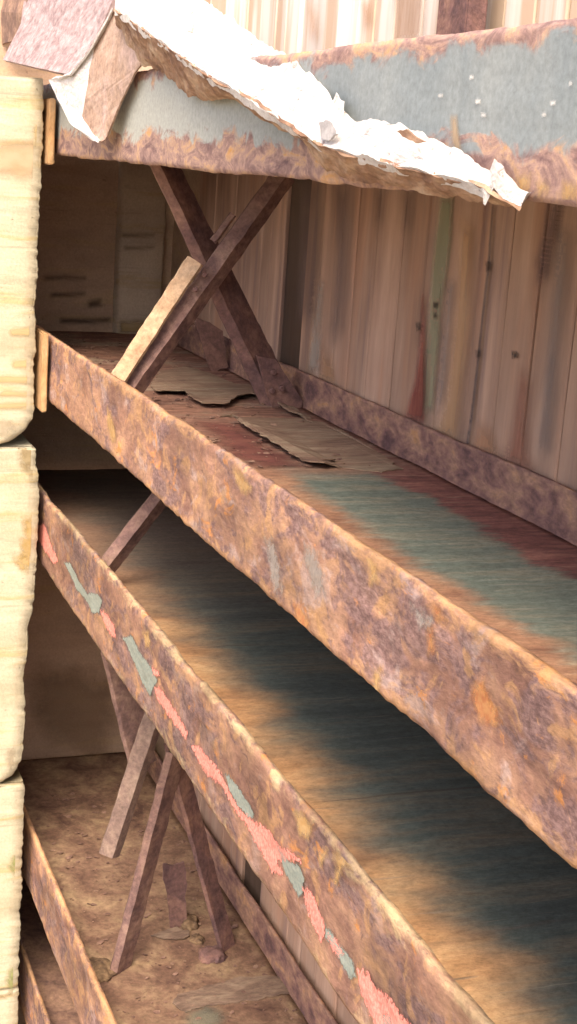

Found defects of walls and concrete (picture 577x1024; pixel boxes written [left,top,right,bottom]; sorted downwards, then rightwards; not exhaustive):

peeling [319,120,339,141]
peeling [397,129,429,143]
rust [441,233,469,434]
rust [406,306,425,420]
rust [206,423,294,465]
rust [295,605,308,627]
rust [473,682,497,724]
rust [296,816,310,836]